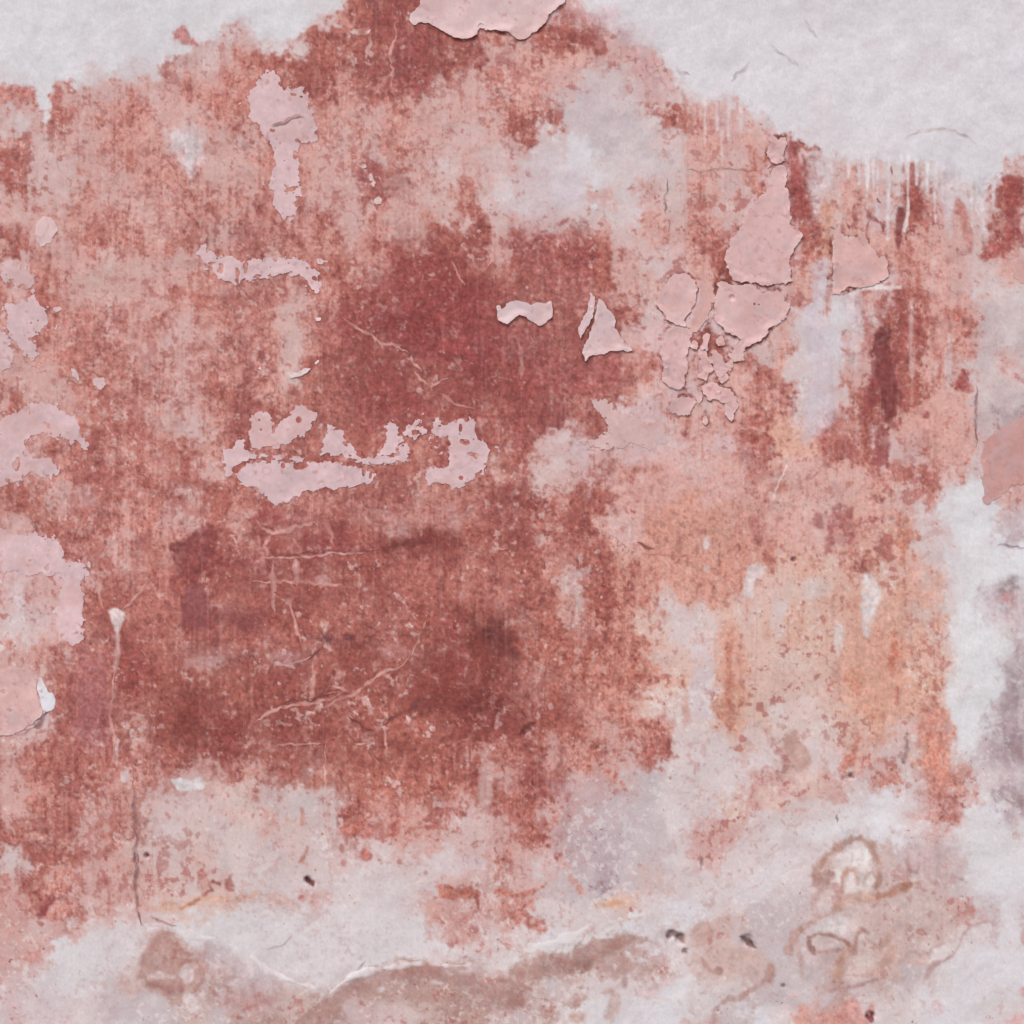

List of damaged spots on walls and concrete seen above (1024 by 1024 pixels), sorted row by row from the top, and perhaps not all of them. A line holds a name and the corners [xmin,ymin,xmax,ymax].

spalling [377,0,676,104]
peeling [238,69,323,222]
peeling [196,244,328,295]
peeling [494,296,556,332]
peeling [576,130,803,496]
peeling [0,391,89,488]
peeling [222,405,500,507]
peeling [980,416,1024,543]
peeling [0,526,91,646]
crack [252,521,433,757]
peeling [0,667,56,736]
crack [275,741,354,892]